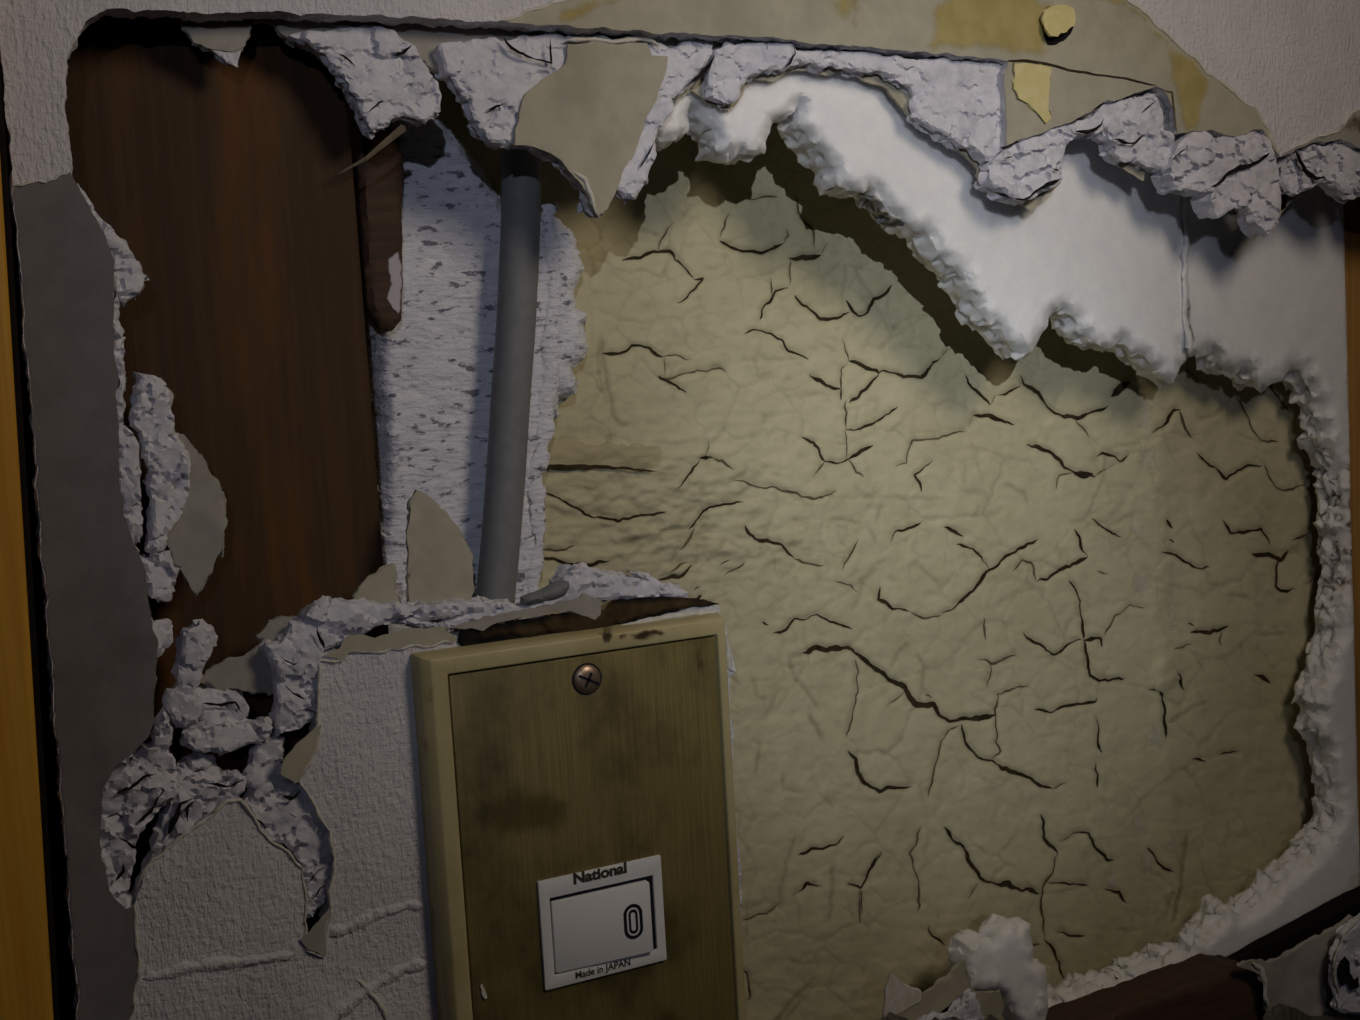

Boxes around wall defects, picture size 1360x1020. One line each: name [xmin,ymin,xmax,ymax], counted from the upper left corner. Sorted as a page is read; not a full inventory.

spalling [192,43,241,68]
peeling [1040,4,1076,37]
spalling [284,25,1360,239]
spalling [77,183,191,603]
spalling [100,562,689,918]
peeling [882,971,985,1020]
spalling [1328,913,1360,1015]